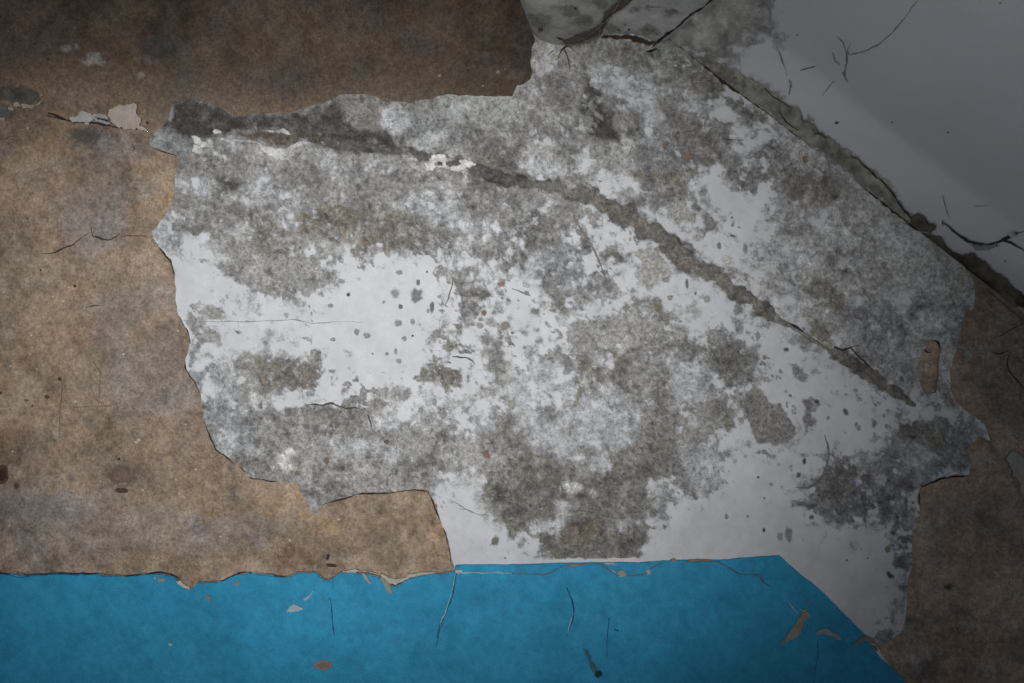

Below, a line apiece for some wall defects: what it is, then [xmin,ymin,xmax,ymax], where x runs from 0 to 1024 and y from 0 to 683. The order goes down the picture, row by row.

crack [600,0,1024,388]
spalling [0,0,771,594]
leakage [149,0,986,647]
crack [575,218,610,286]
peeling [741,364,820,458]
spalling [815,213,1024,683]
peeling [287,591,313,612]
crack [566,587,575,635]
peeling [780,600,811,645]